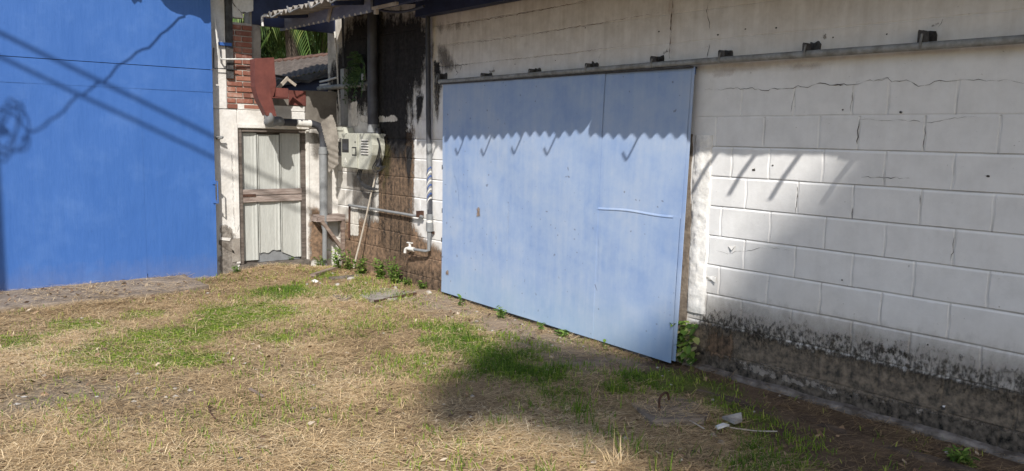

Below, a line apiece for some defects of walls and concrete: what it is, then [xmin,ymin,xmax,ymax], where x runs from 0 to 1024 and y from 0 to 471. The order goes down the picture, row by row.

peeling [337,101,397,136]
damp [329,9,445,293]
crack [718,77,1020,149]
damp [691,312,1024,454]